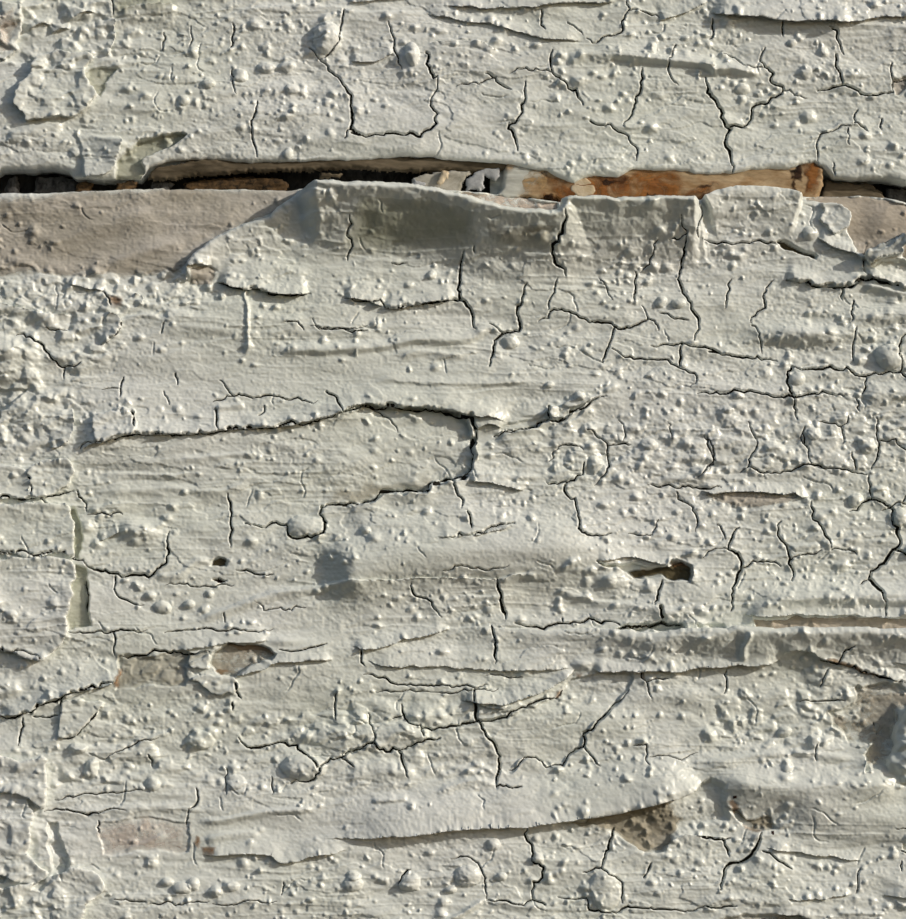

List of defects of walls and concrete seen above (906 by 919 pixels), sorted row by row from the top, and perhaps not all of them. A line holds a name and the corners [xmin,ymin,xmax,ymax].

crack [312,10,580,151]
peeling [82,136,122,178]
peeling [0,166,906,317]
crack [80,378,659,547]
crack [344,203,906,617]
crack [0,533,327,659]
peeling [212,643,329,676]
crack [240,565,680,793]
peeling [604,546,674,567]
peeling [464,605,906,779]
peeling [206,767,702,864]
crack [456,828,792,913]